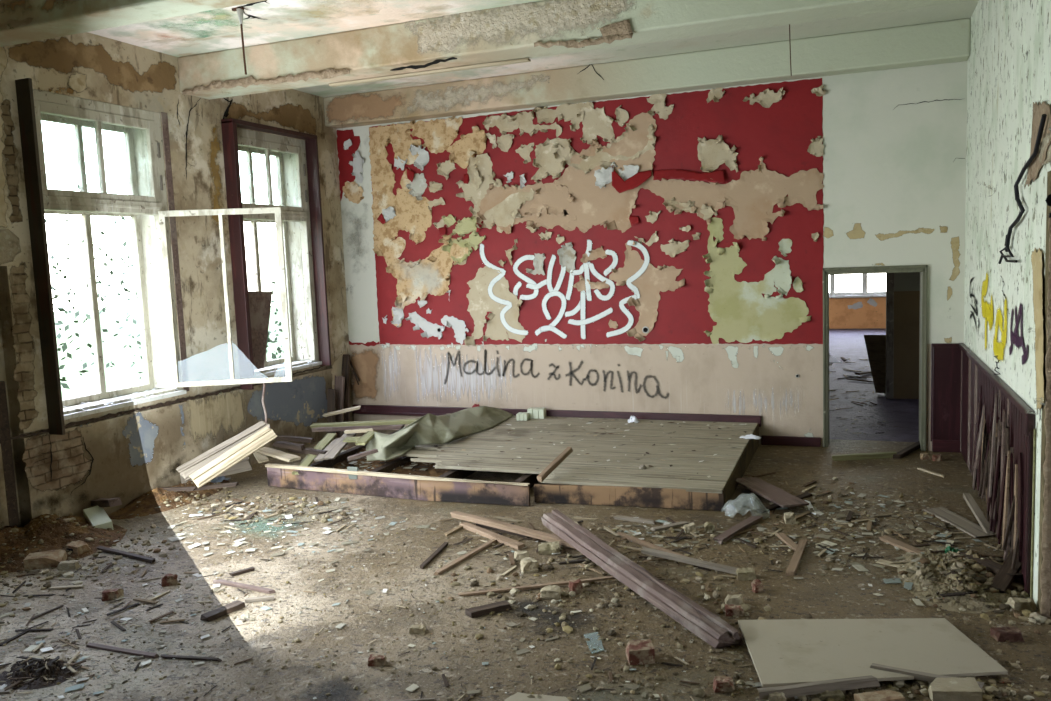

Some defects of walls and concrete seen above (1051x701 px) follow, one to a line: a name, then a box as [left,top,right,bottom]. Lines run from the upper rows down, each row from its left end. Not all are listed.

spalling [534,19,633,48]
peeling [8,37,350,96]
crack [390,57,457,71]
peeling [707,87,725,103]
peeling [743,87,785,108]
spalling [1025,101,1051,187]
peeling [342,93,824,346]
spalling [812,227,833,242]
spalling [846,223,960,301]
flaking render [9,262,92,491]